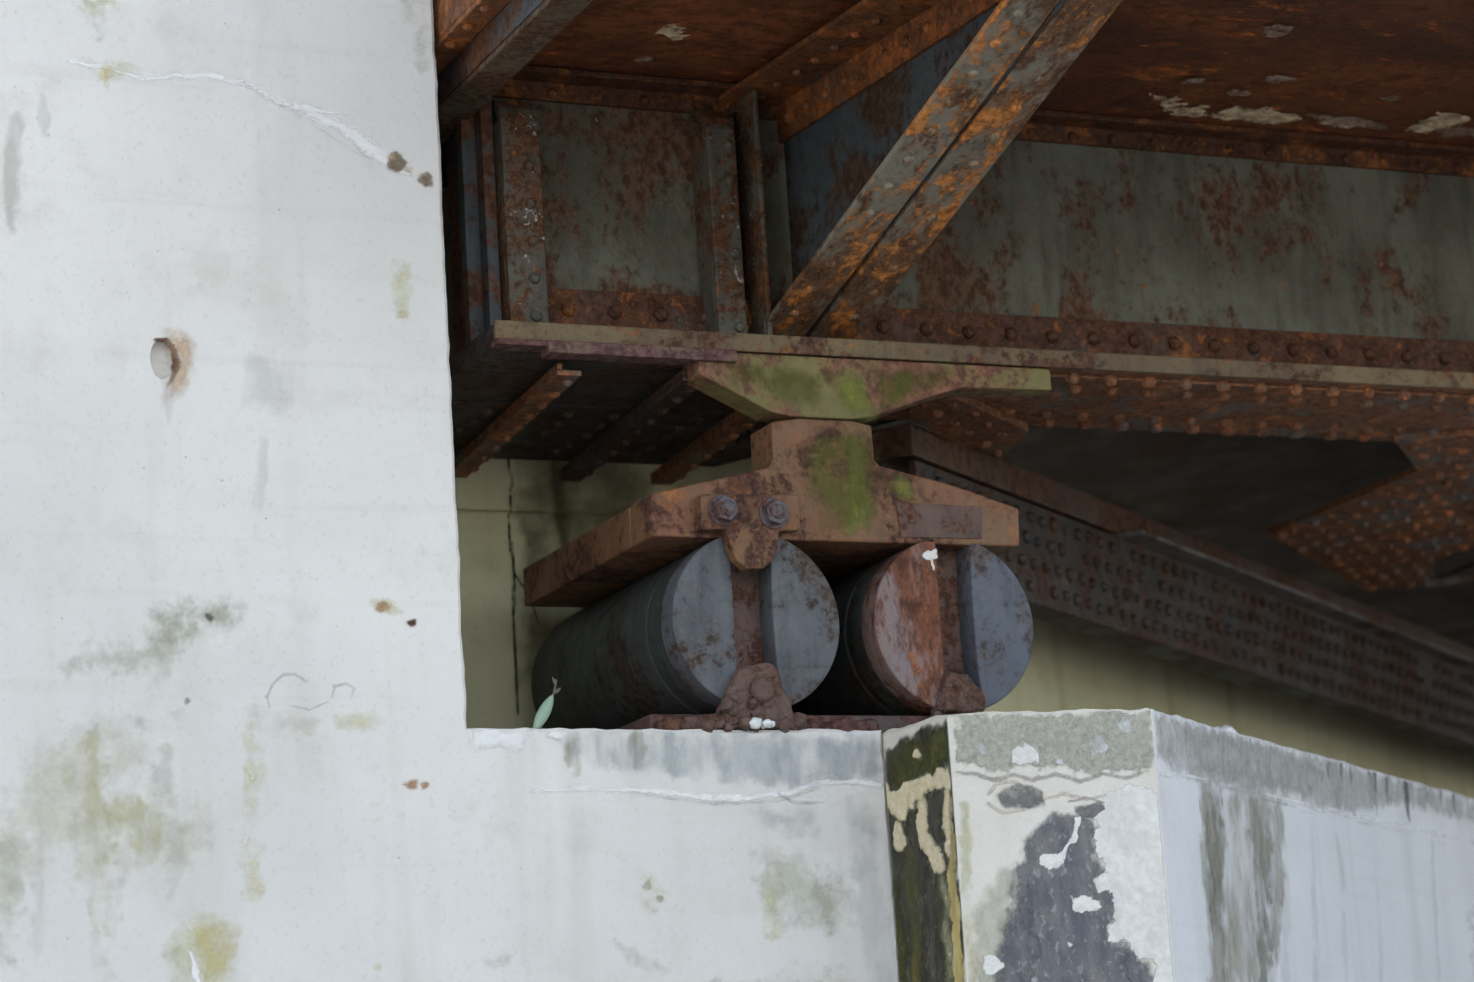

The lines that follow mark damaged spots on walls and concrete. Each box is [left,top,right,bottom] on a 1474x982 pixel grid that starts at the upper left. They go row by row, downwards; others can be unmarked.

peeling [1262,24,1293,38]
crack [68,60,411,175]
peeling [1149,78,1384,130]
peeling [1409,112,1474,138]
spalling [150,338,190,388]
rust [700,693,807,733]
rust [929,698,961,718]
water stain [886,711,1473,982]
peeling [963,772,1173,982]
water stain [189,944,223,982]